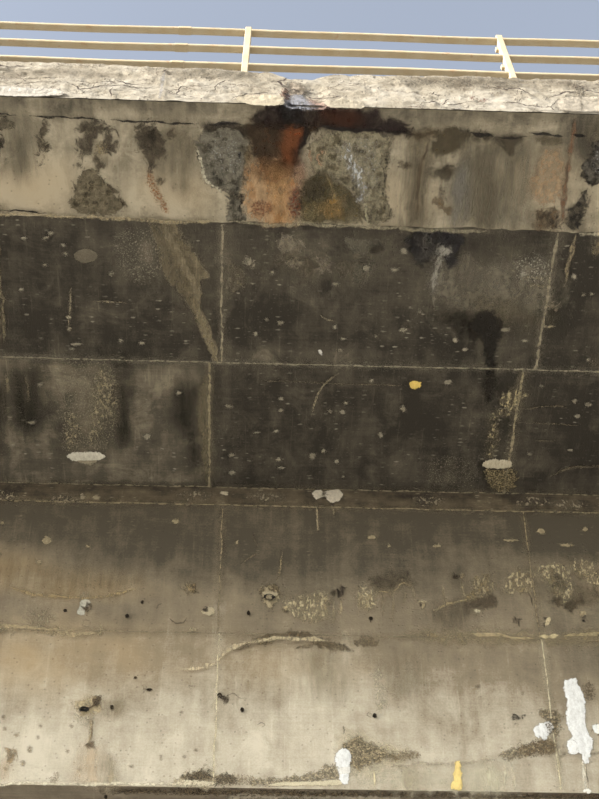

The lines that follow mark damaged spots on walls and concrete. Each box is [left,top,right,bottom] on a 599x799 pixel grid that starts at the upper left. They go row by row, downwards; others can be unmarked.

spalling [0,116,15,147]
spalling [69,119,127,217]
spalling [134,118,175,214]
spalling [193,123,252,224]
corrosion [242,103,413,225]
spalling [535,141,599,231]
damp [0,212,219,364]
damp [442,310,526,459]
spalling [172,768,237,799]